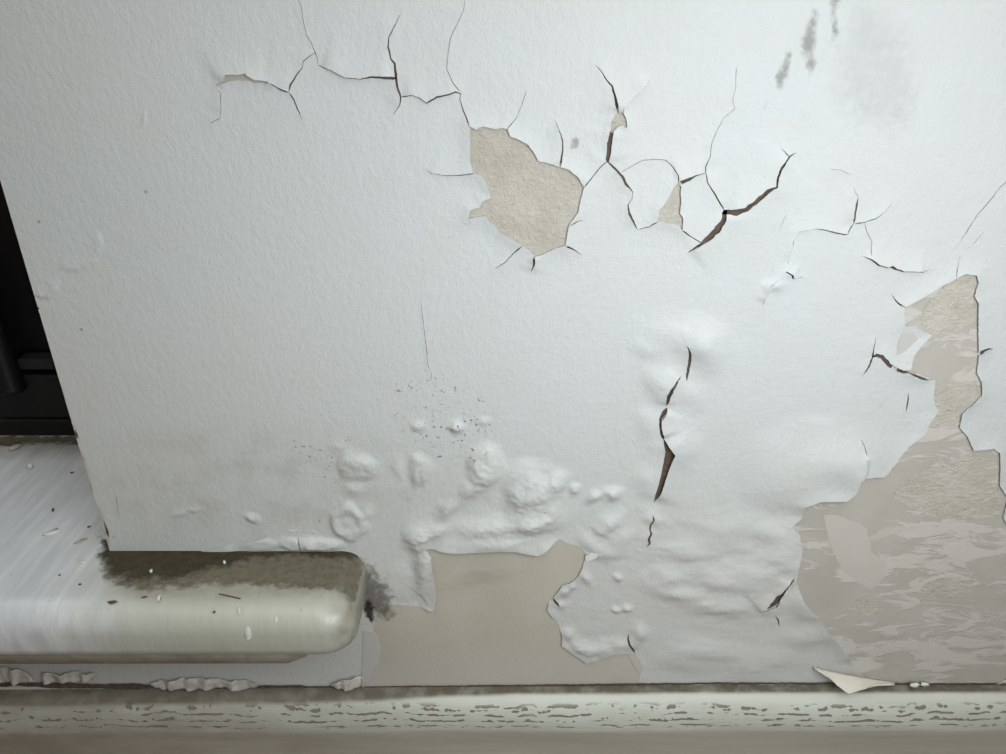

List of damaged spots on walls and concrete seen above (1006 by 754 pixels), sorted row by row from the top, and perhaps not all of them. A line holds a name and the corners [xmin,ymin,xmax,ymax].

peeling [184,0,615,308]
crack [551,5,924,306]
crack [948,176,1006,260]
peeling [756,214,1006,694]
peeling [0,666,95,686]
peeling [150,677,258,692]
peeling [330,676,363,692]